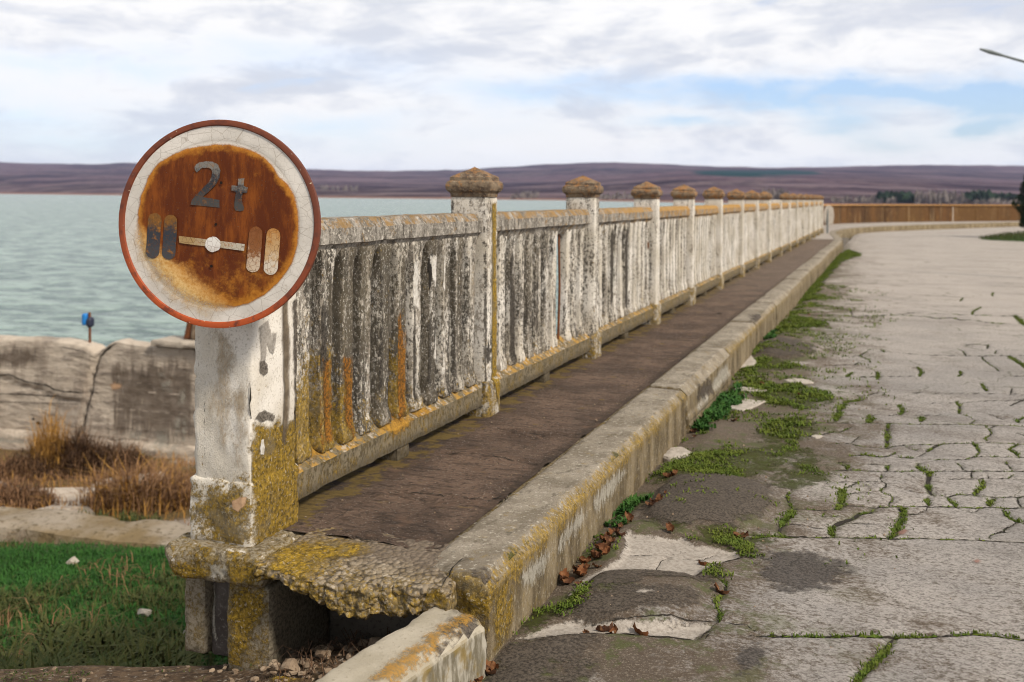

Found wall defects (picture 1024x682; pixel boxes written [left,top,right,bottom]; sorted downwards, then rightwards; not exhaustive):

crack [0,343,117,430]
rust [138,144,299,309]
rust [320,357,355,445]
rust [388,313,406,423]
mould [406,306,432,404]
damp [509,256,517,361]
damp [609,229,628,308]
crack [752,292,1024,543]
spalling [519,617,711,640]
spalling [569,530,740,595]
crack [572,556,1024,682]
damp [754,549,854,592]